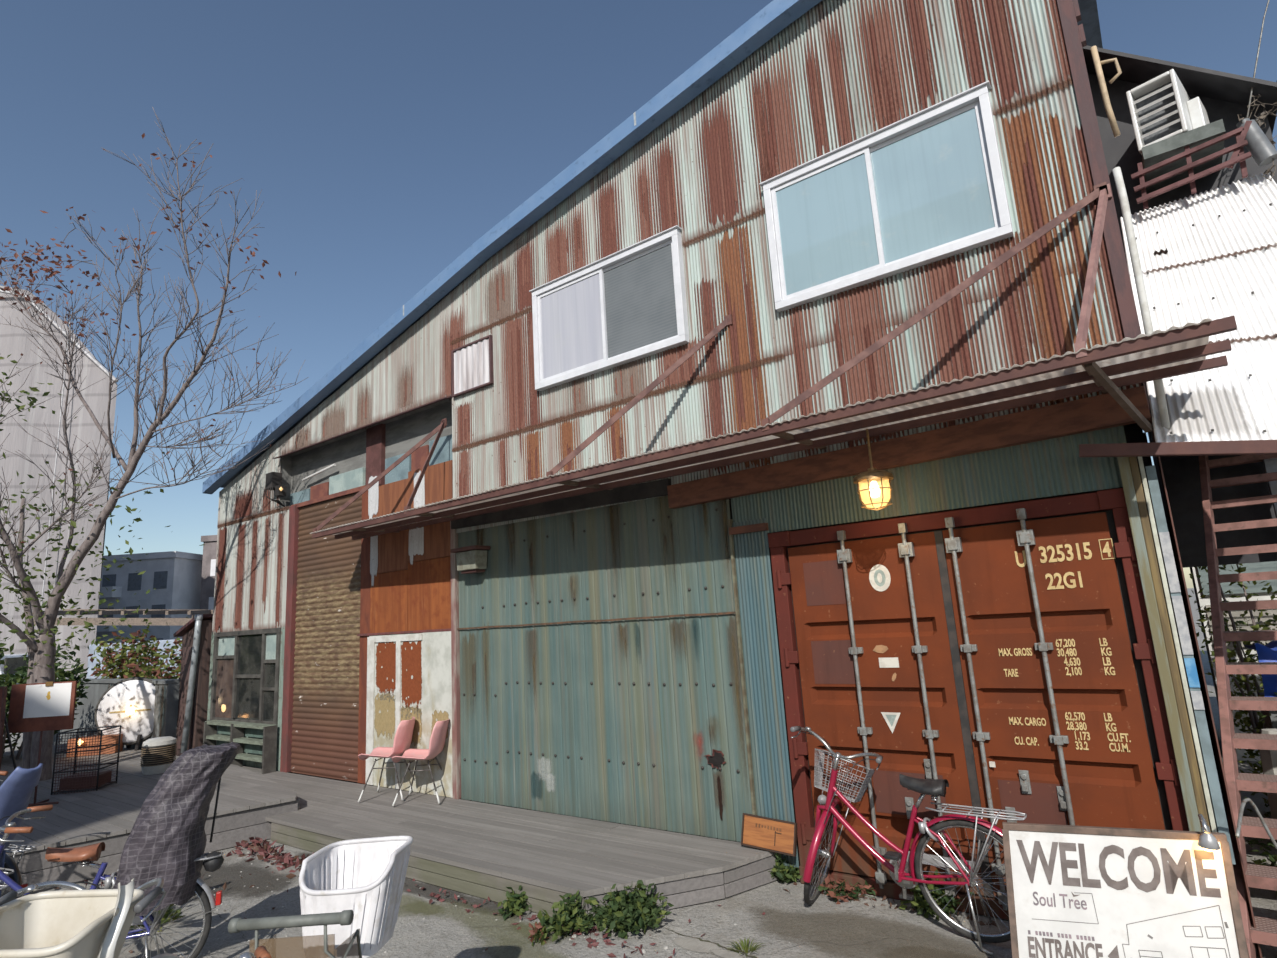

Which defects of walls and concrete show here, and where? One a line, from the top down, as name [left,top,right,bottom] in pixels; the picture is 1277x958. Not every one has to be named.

corrosion [440,0,943,497]
corrosion [909,0,1125,388]
corrosion [295,384,373,450]
corrosion [399,365,414,411]
corrosion [213,486,290,632]
peeling [374,640,449,746]